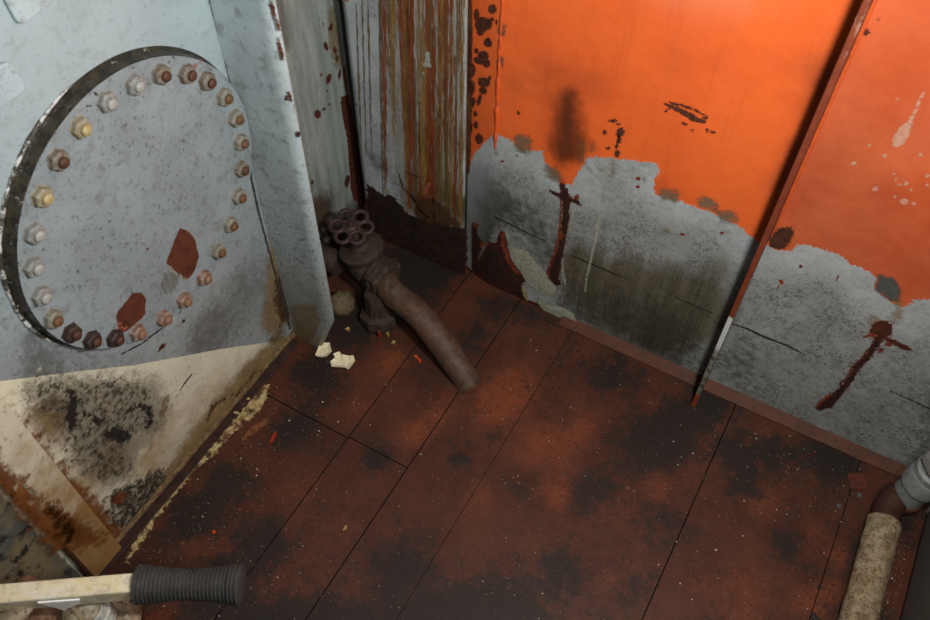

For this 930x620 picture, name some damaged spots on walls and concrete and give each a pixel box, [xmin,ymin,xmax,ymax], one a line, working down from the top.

rust [340,0,469,276]
spalling [664,101,716,134]
peeling [471,223,577,321]
rust [546,179,582,286]
rust [164,249,290,478]
rust [809,320,912,411]
rust [0,398,123,555]
mould [28,376,166,530]